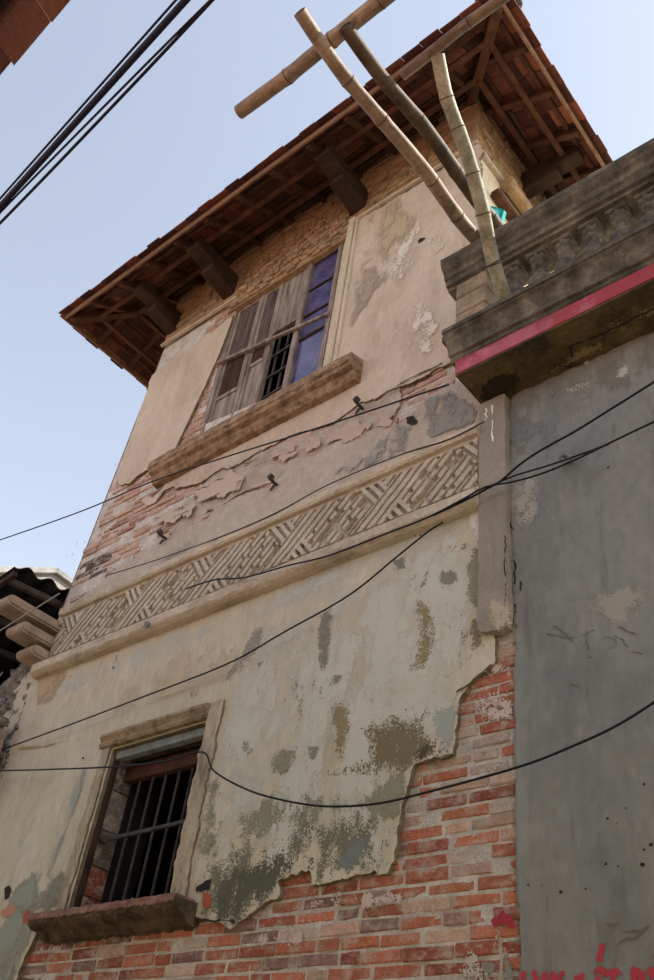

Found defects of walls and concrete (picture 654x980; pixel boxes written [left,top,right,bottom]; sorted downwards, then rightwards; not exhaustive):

flaking render [271,368,455,462]
flaking render [69,460,252,603]
flaking render [20,635,529,980]
damp [195,707,449,927]
spalling [0,886,30,924]